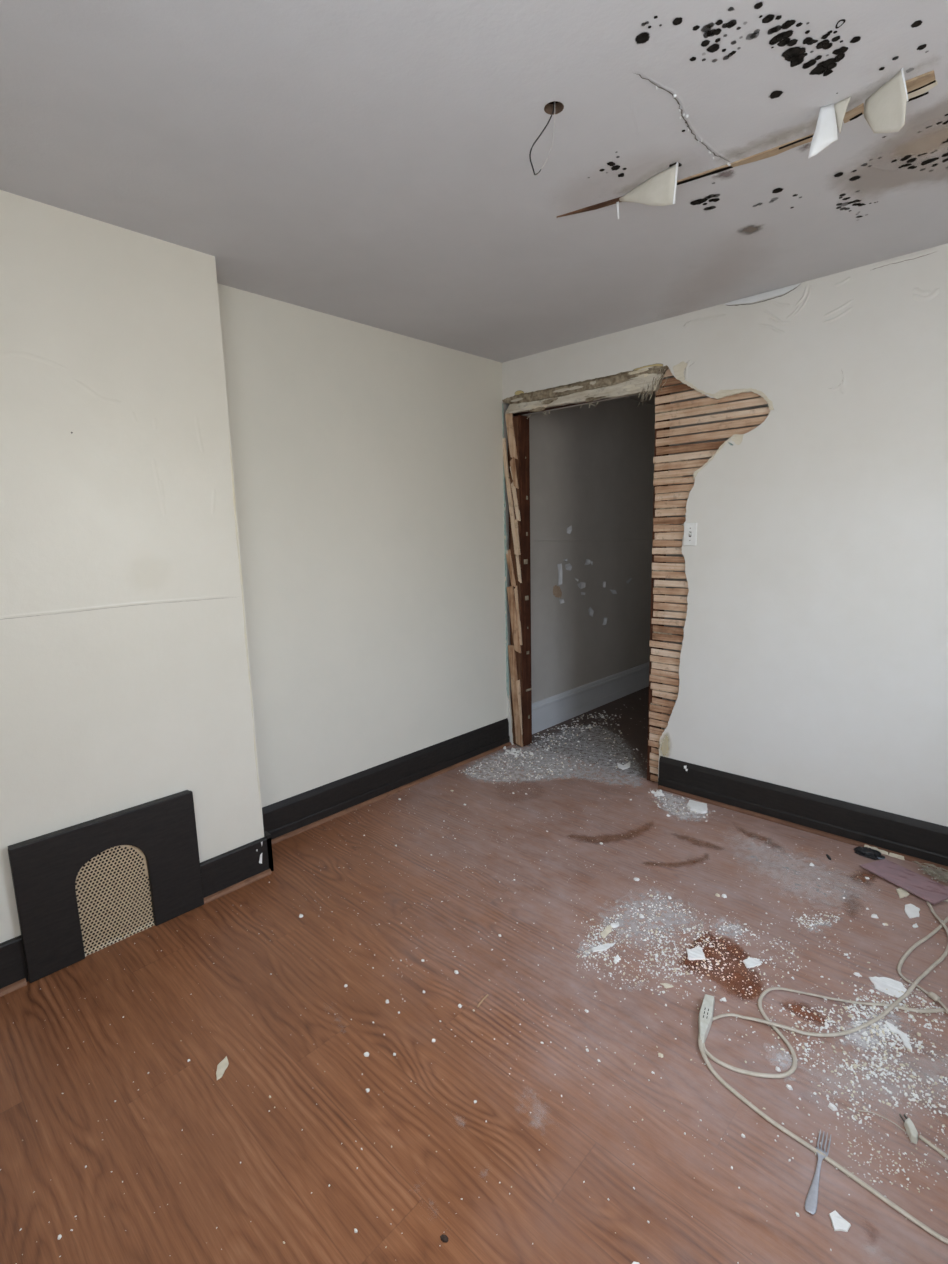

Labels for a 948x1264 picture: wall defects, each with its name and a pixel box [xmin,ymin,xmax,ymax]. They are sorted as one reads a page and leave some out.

leakage [635,2,861,76]
crack [632,70,733,166]
leakage [600,152,627,177]
leakage [690,194,720,210]
leakage [834,163,876,218]
leakage [891,139,948,169]
spalling [502,361,774,782]